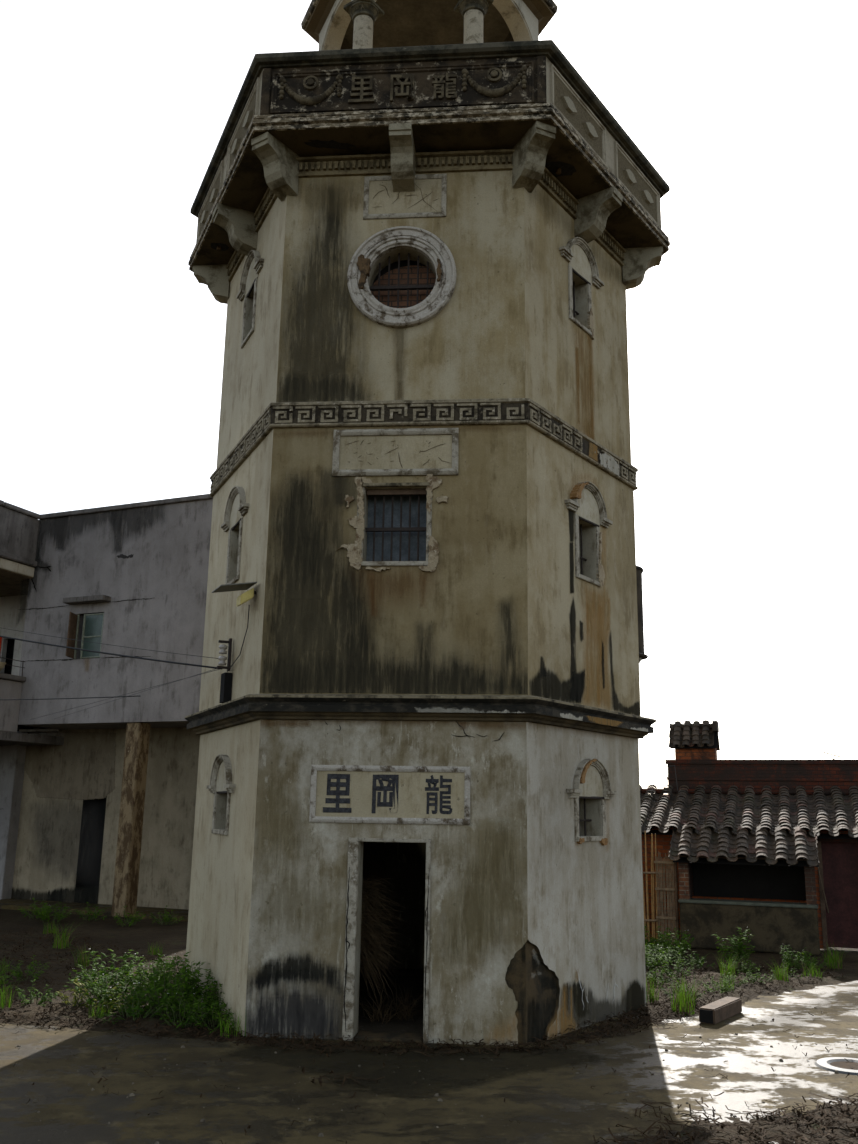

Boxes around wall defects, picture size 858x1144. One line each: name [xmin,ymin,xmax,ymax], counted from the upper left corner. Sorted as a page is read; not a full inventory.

leakage [283,192,361,402]
flaking render [336,477,391,572]
leakage [263,480,585,721]
flaking render [419,536,439,573]
flaking render [426,474,448,513]
leakage [602,635,640,716]
leakage [228,946,645,1097]
spalling [505,940,560,1045]